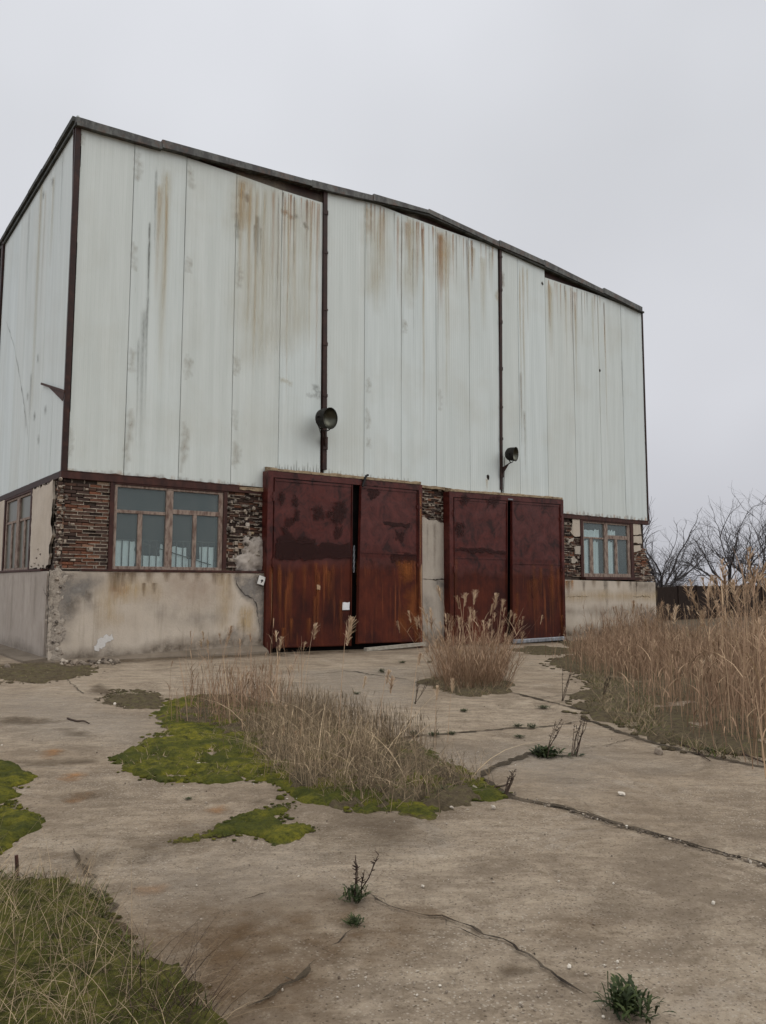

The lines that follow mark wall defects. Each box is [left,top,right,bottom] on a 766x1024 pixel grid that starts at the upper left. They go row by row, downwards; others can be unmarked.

spalling [30,477,110,660]
spalling [226,492,262,571]
rust [275,492,351,561]
crack [541,800,766,865]
crack [369,894,603,1015]